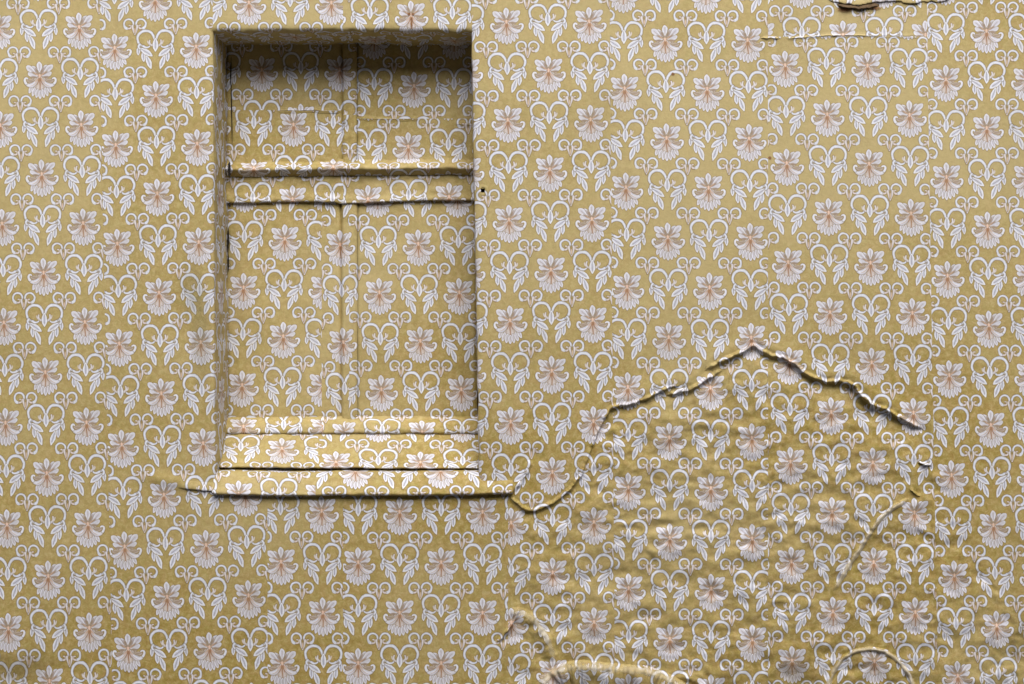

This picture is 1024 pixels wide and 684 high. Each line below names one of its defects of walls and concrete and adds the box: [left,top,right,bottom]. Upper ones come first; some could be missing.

spalling [829,0,950,11]